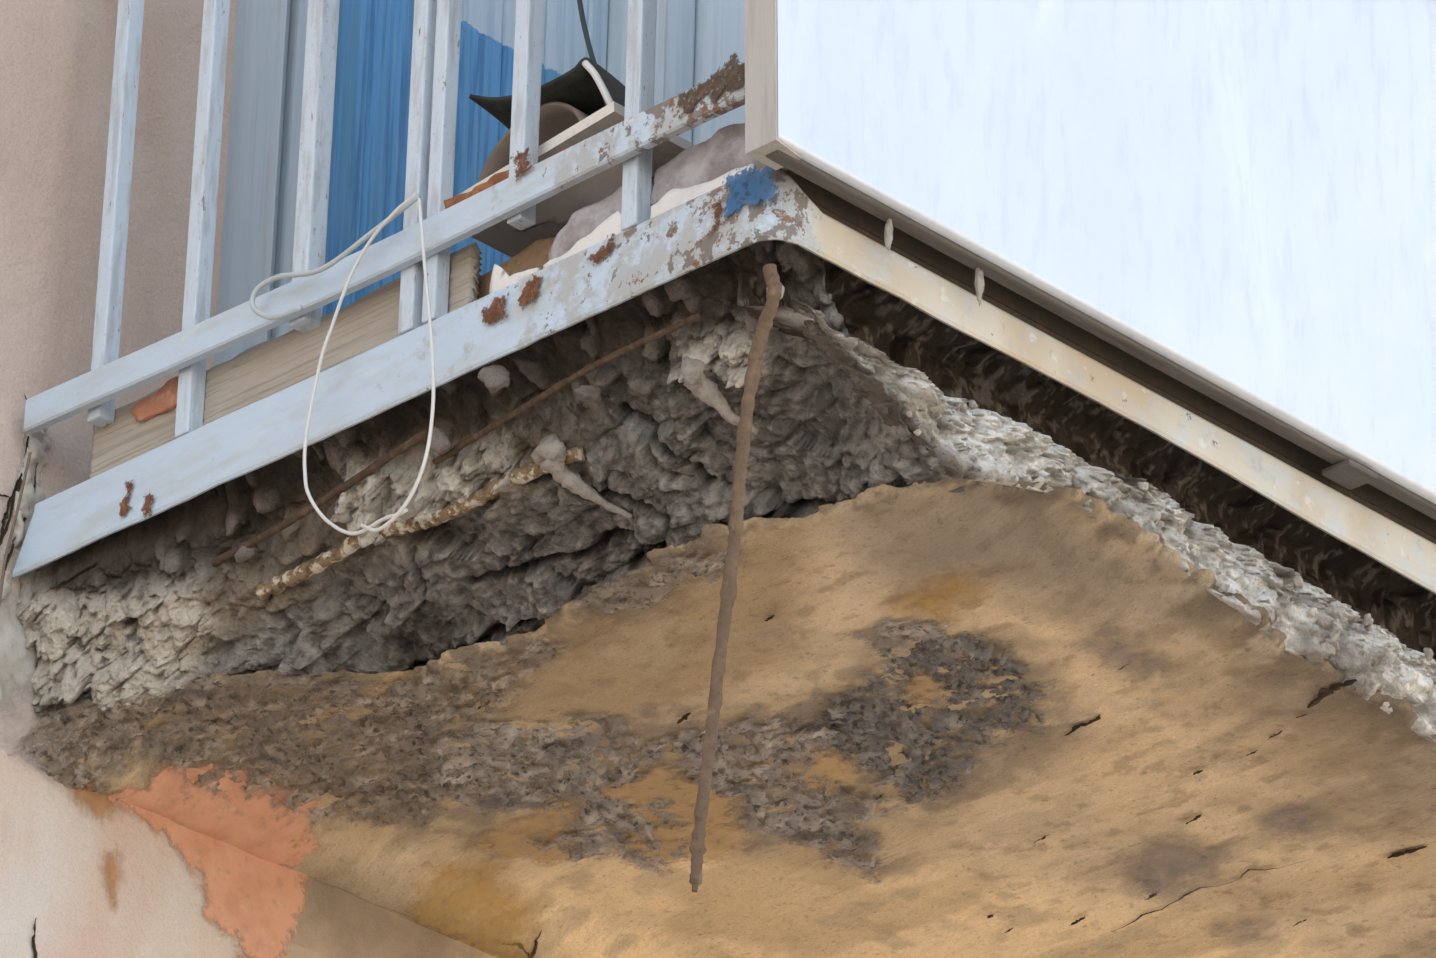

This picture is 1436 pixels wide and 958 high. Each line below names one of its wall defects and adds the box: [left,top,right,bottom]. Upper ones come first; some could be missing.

corrosion [677,53,745,118]
corrosion [444,146,533,209]
corrosion [707,200,727,235]
corrosion [587,234,616,266]
corrosion [481,275,544,325]
crack [0,436,38,576]
corrosion [119,480,154,518]
spalling [0,240,1436,958]
crack [30,918,38,958]